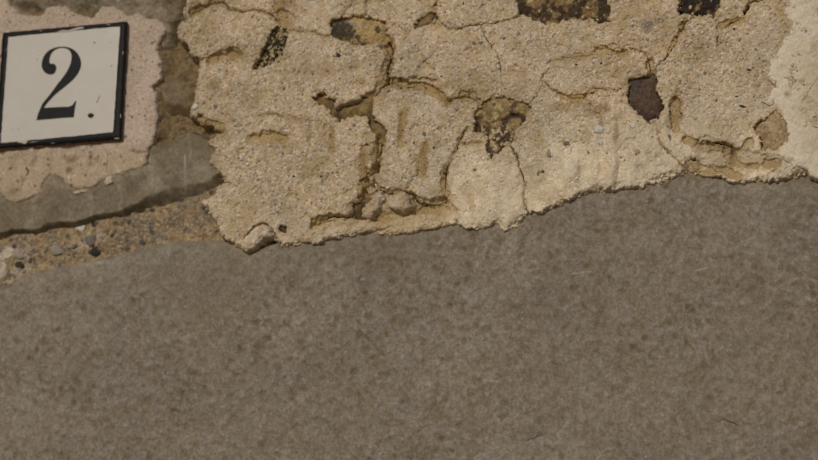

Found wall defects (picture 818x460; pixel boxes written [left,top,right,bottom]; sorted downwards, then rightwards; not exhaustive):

hole [256,25,290,70]
spalling [331,16,390,46]
crack [375,26,480,104]
crack [433,3,503,85]
spalling [516,0,611,25]
spalling [679,0,720,19]
spalling [628,74,664,123]
spalling [475,97,531,157]
crack [367,129,478,206]
spalling [354,197,369,220]